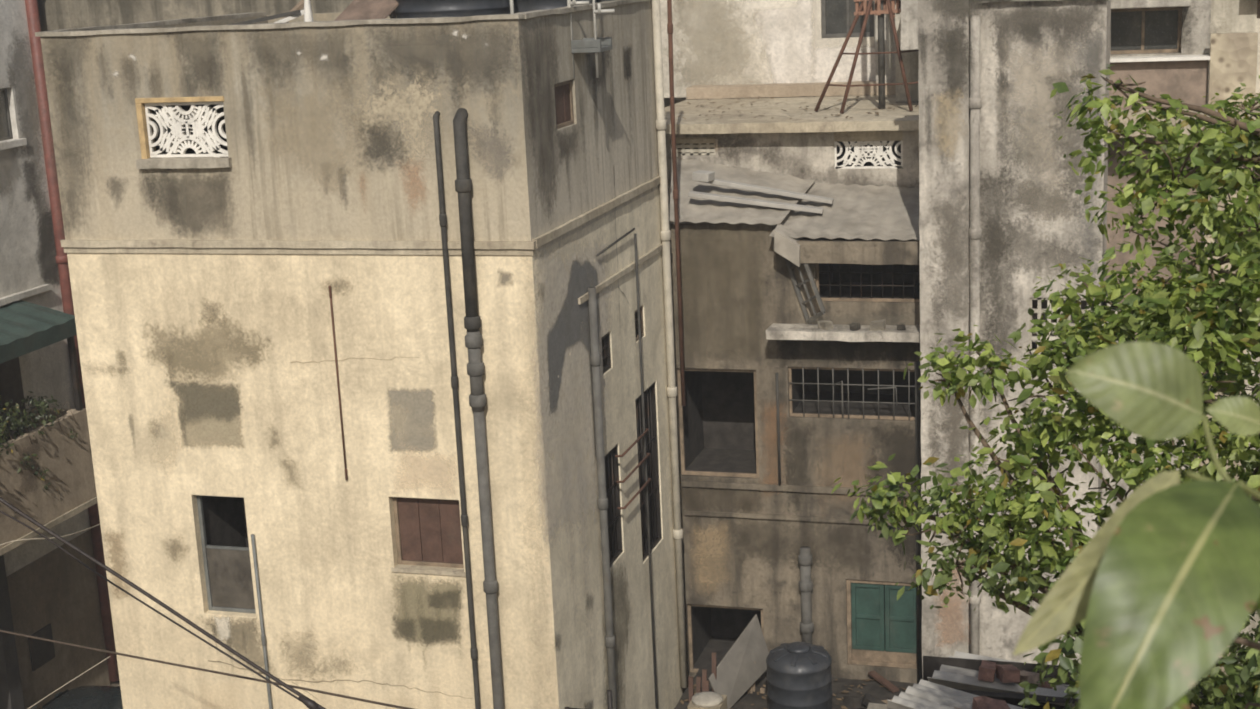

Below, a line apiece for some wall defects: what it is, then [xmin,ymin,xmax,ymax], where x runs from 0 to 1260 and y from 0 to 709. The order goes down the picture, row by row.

water stain [150,173,227,232]
water stain [362,126,404,170]
water stain [375,25,576,206]
water stain [777,0,1107,564]
water stain [149,306,270,429]
water stain [393,577,462,644]